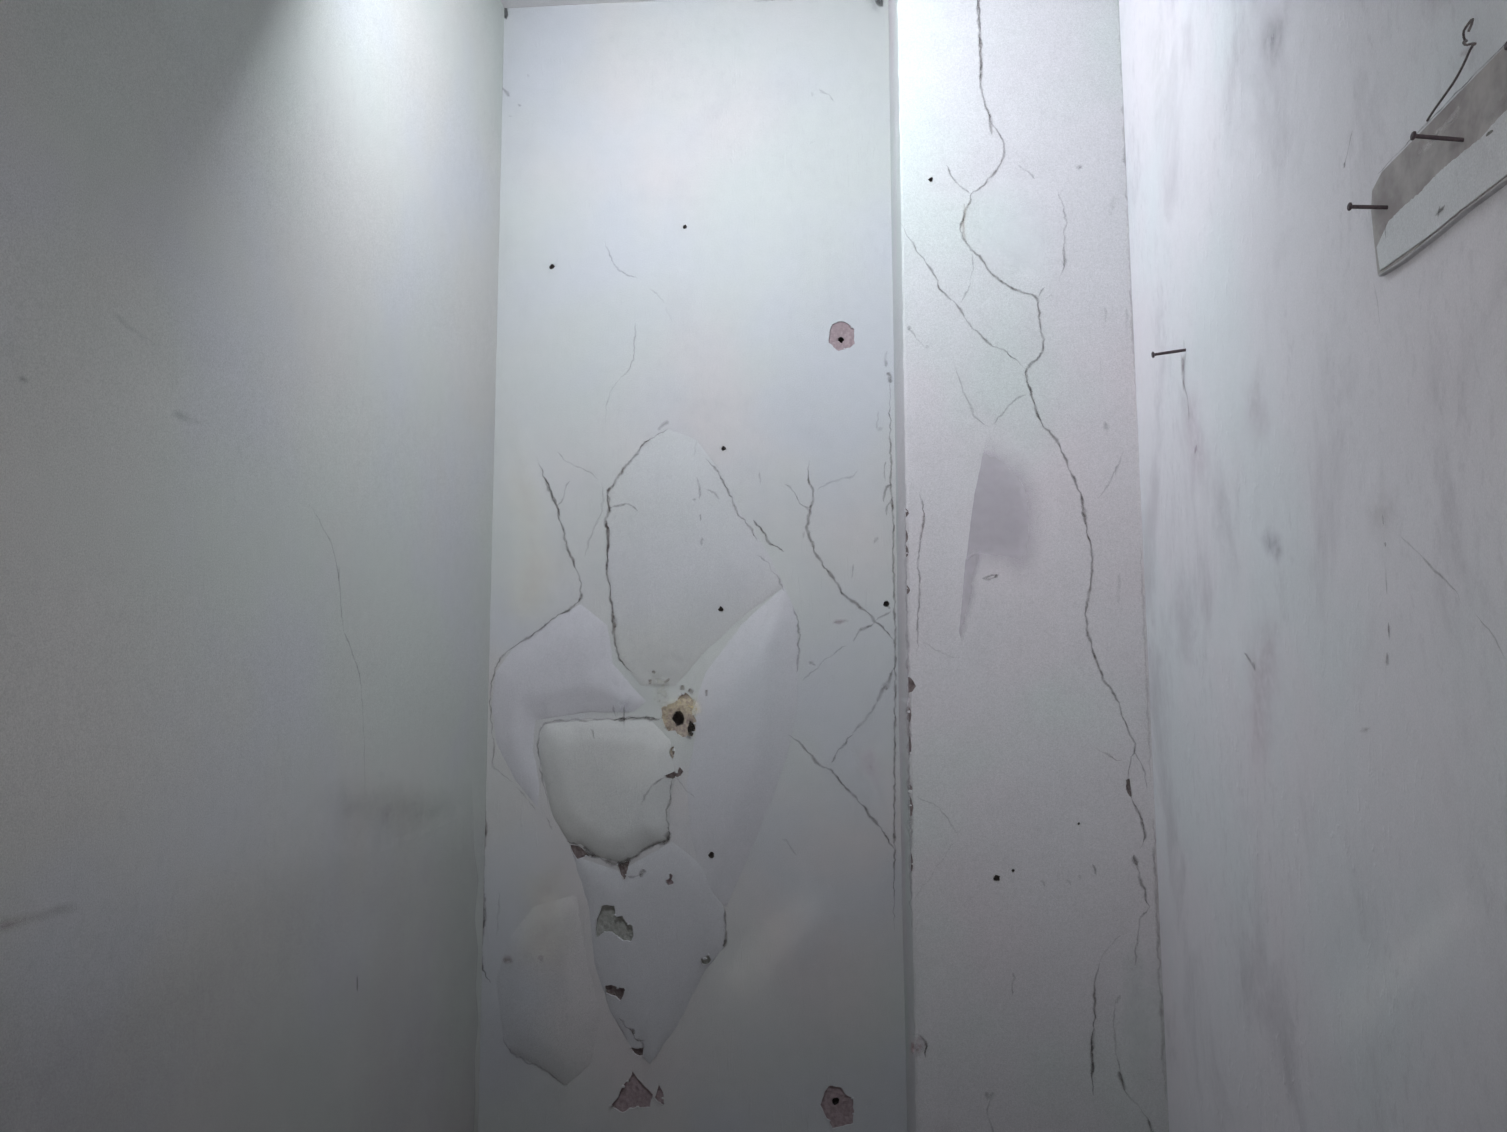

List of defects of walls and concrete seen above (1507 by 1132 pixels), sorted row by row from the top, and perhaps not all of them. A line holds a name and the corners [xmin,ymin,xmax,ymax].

spalling [829,322,855,351]
crack [490,440,649,711]
spalling [653,671,707,779]
spalling [571,845,591,859]
spalling [616,861,629,879]
spalling [596,905,633,941]
spalling [605,985,626,1000]
crack [1091,987,1120,1084]
spalling [609,1047,664,1112]
spalling [821,1086,854,1128]